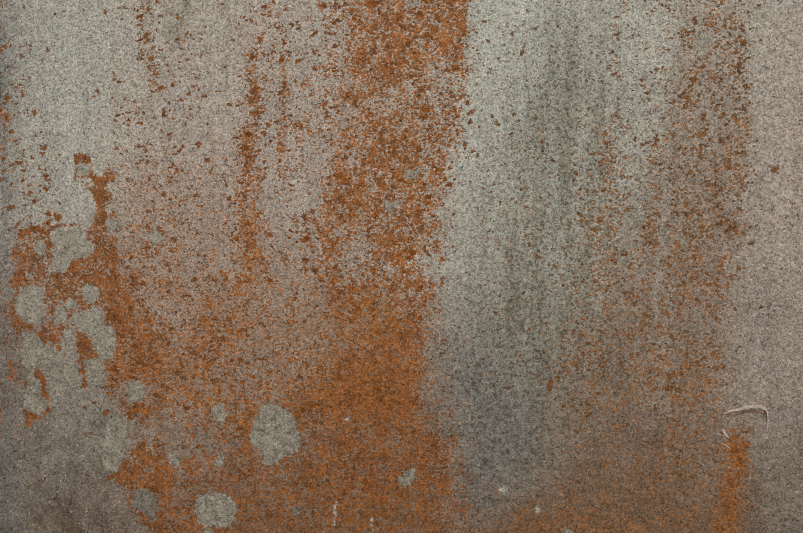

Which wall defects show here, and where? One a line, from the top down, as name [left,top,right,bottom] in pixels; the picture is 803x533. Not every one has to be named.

rust [718,412,780,533]